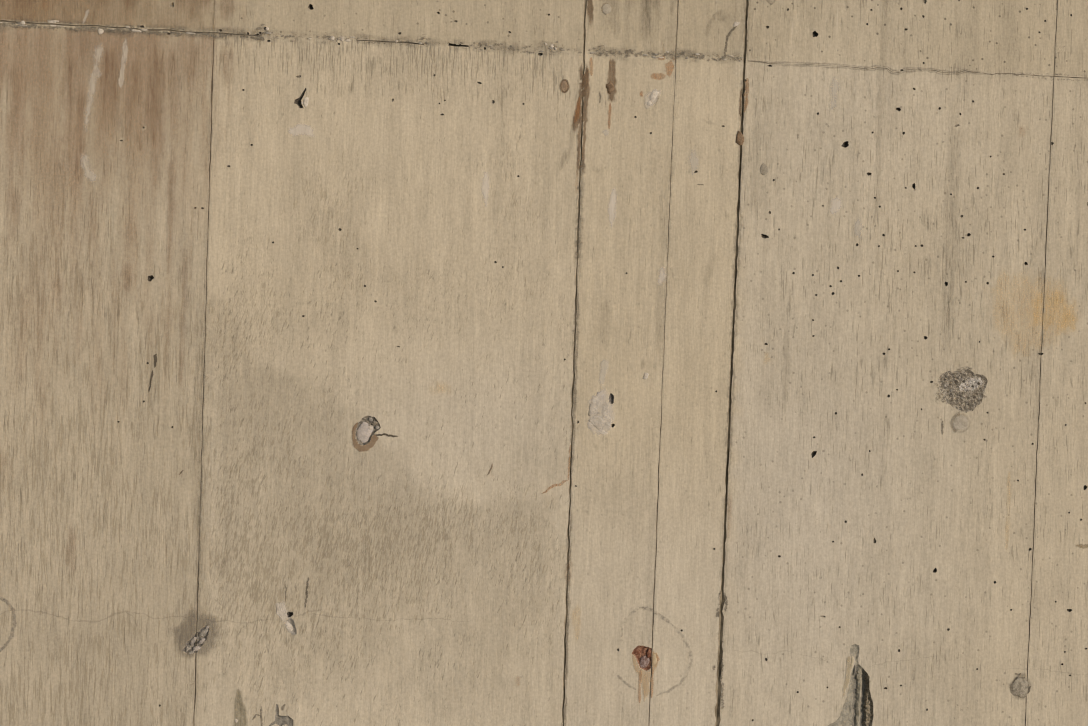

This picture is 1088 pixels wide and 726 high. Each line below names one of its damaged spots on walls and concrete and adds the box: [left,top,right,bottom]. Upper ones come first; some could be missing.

rust [573,68,590,169]
rust [606,60,616,101]
spalling [828,644,874,726]